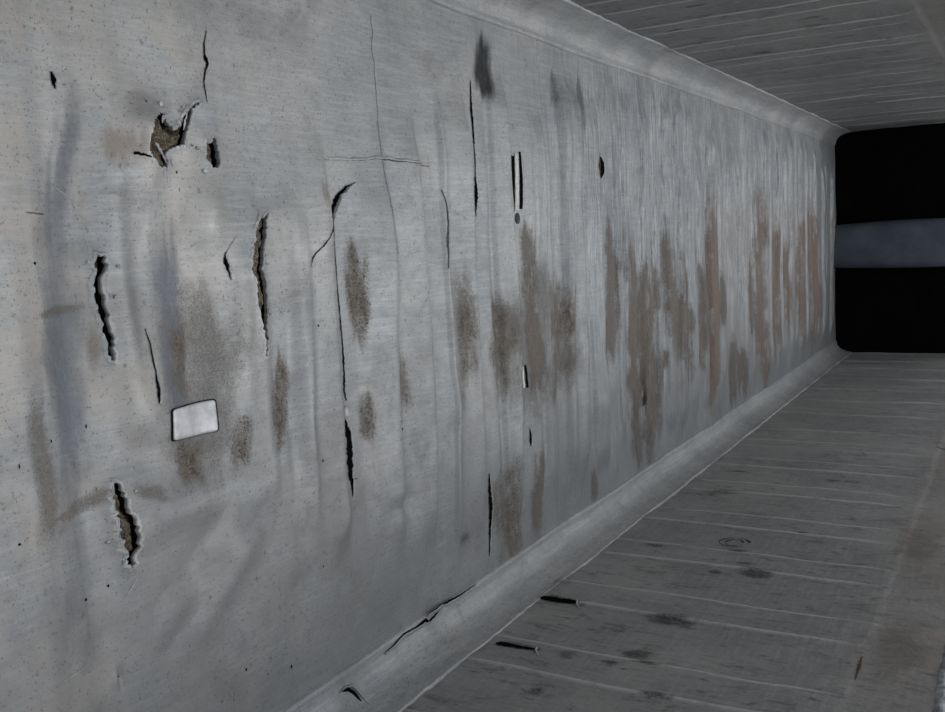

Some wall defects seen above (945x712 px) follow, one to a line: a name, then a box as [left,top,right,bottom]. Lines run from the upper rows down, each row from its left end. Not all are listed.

crack [203,31,211,102]
crack [470,80,478,215]
crack [441,189,450,269]
crack [145,328,163,405]
crack [311,155,429,496]
rust [453,221,579,410]
rust [606,210,749,466]
rust [748,194,821,388]
crack [487,473,495,556]
rust [493,451,545,563]
crack [386,584,477,655]